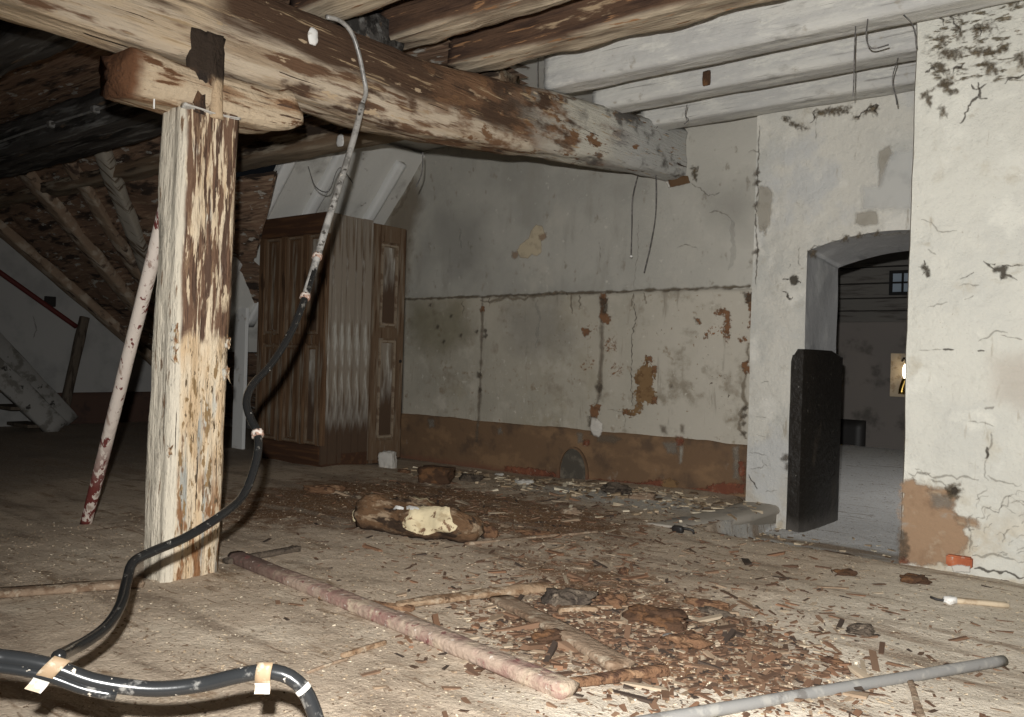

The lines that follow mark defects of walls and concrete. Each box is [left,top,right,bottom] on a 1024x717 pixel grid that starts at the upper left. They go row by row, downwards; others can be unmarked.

water stain [921,2,1024,123]
water stain [811,104,878,123]
rust [581,293,622,418]
rust [622,355,657,418]
peeling [899,479,978,572]
crack [975,567,1024,579]